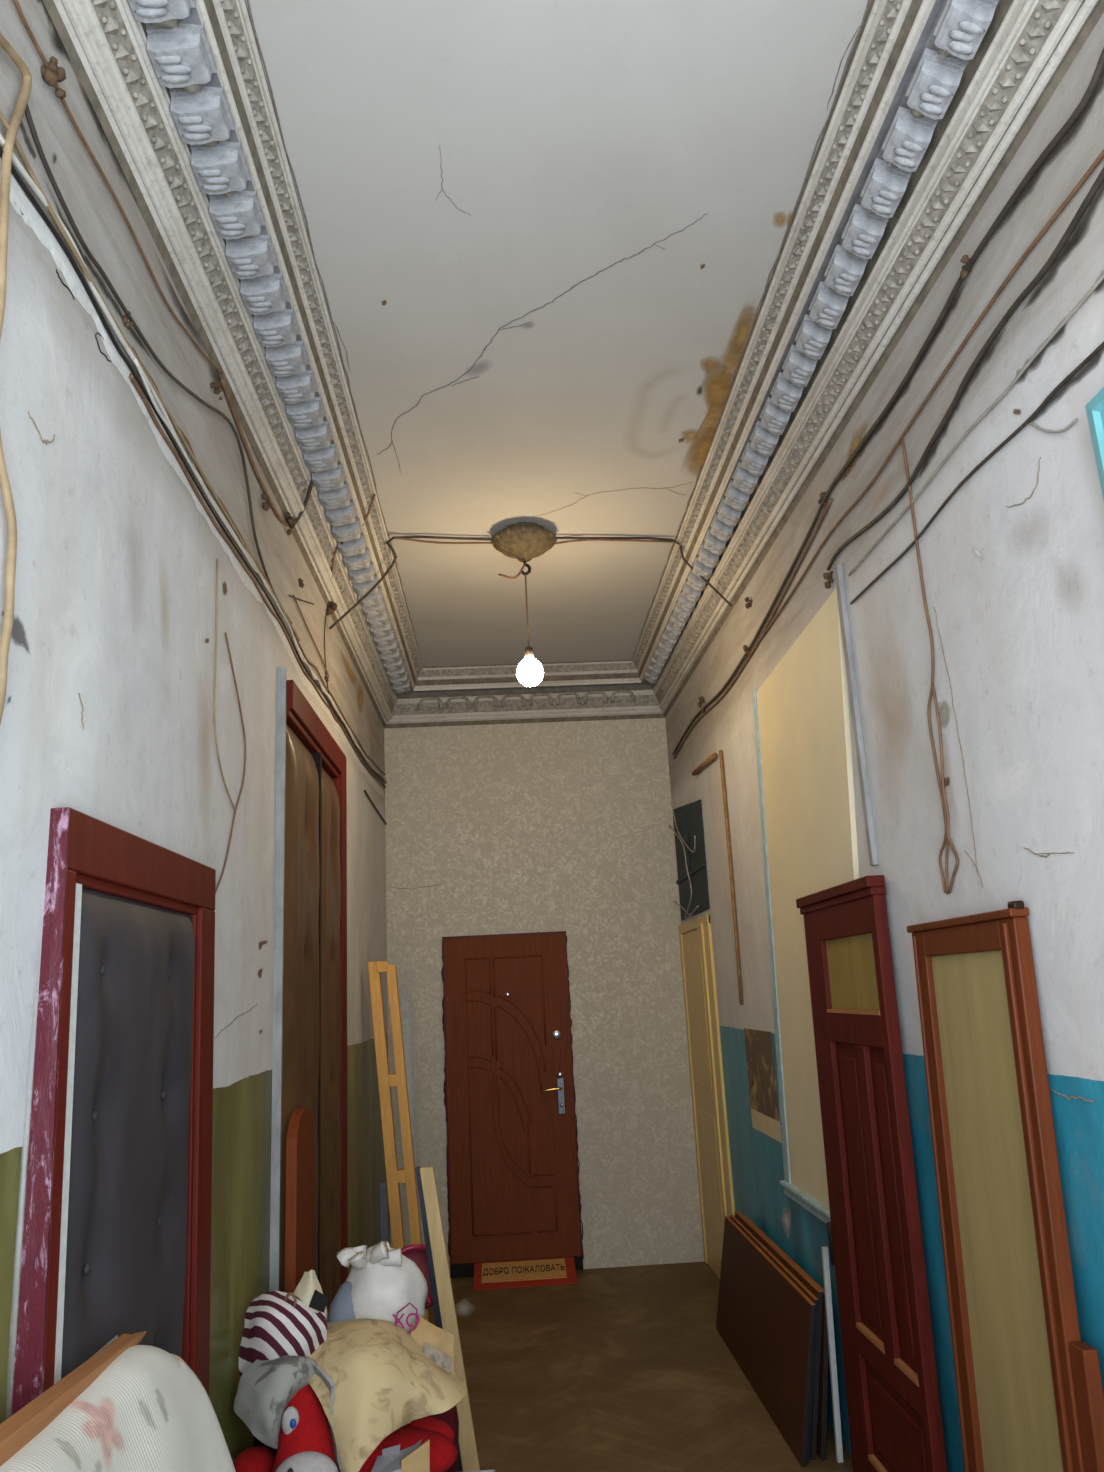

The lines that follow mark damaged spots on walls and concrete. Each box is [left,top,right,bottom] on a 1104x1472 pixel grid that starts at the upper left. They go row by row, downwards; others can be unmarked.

crack [247,0,707,645]
water stain [685,319,750,466]